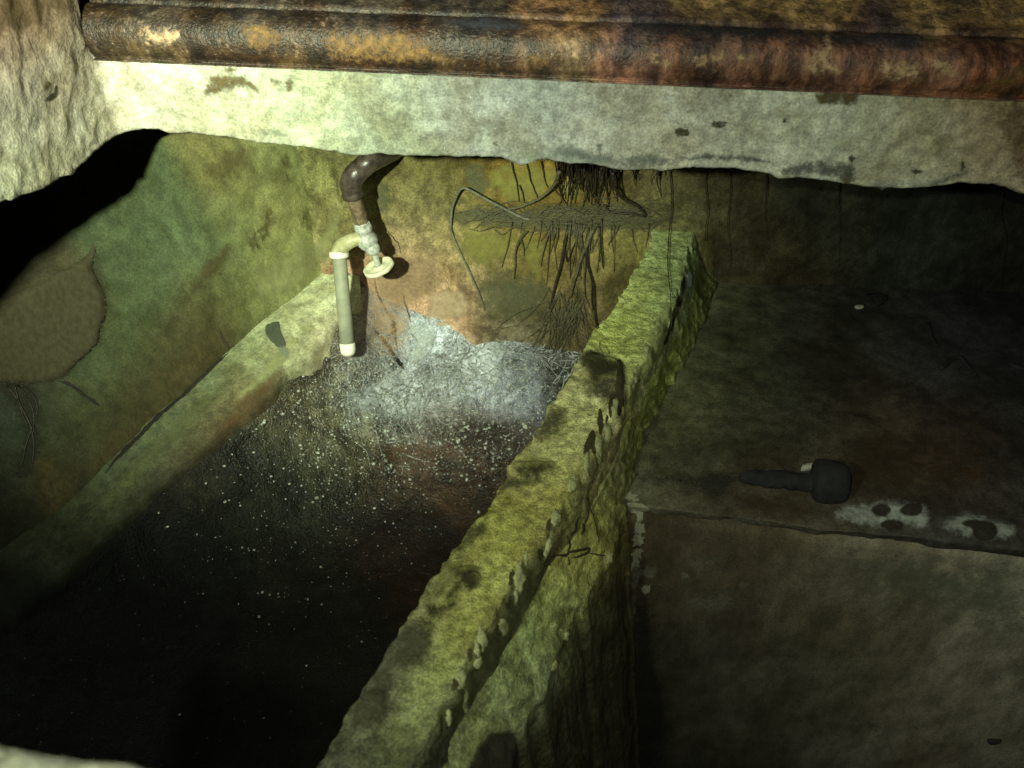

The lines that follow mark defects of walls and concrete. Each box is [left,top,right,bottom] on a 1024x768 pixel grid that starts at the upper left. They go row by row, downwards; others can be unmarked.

rust [143,26,180,45]
rust [243,25,282,49]
rust [322,31,448,64]
rust [693,50,753,66]
rust [803,34,842,75]
rust [879,48,959,81]
rust [205,67,257,94]
damp [691,149,770,163]
damp [782,137,855,184]
peeling [0,245,107,385]
efflorescence [837,502,928,529]
efflorescence [946,515,1014,540]